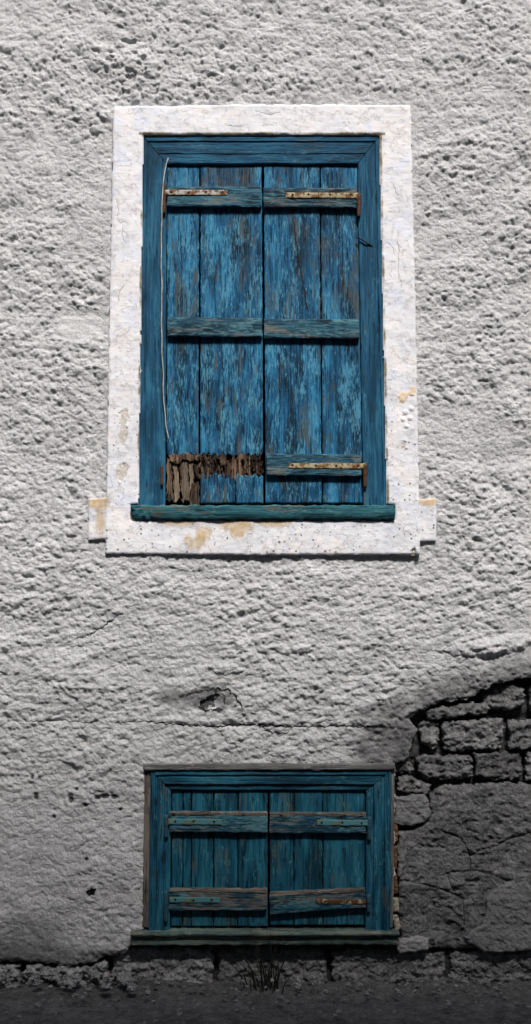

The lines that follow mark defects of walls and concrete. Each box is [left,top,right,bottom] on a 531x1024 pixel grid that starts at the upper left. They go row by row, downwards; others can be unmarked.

flaking render [165,687,244,712]
flaking render [385,677,531,958]